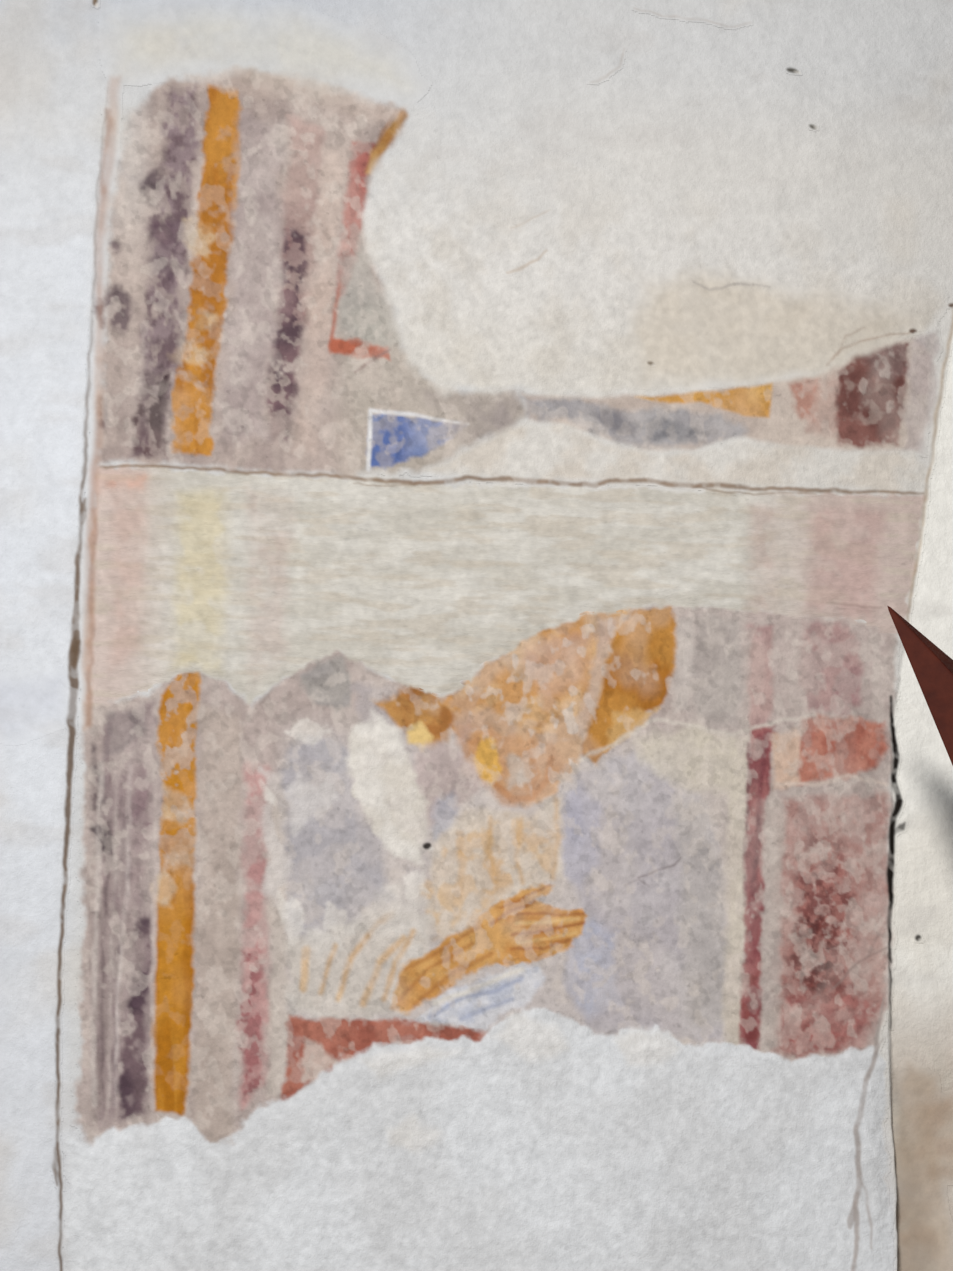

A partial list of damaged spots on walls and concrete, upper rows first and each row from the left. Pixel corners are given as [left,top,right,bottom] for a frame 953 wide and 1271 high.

crack [504,207,553,276]
crack [690,280,773,293]
crack [98,298,953,624]
crack [50,79,110,1271]
crack [622,855,683,889]
crack [826,693,908,1271]